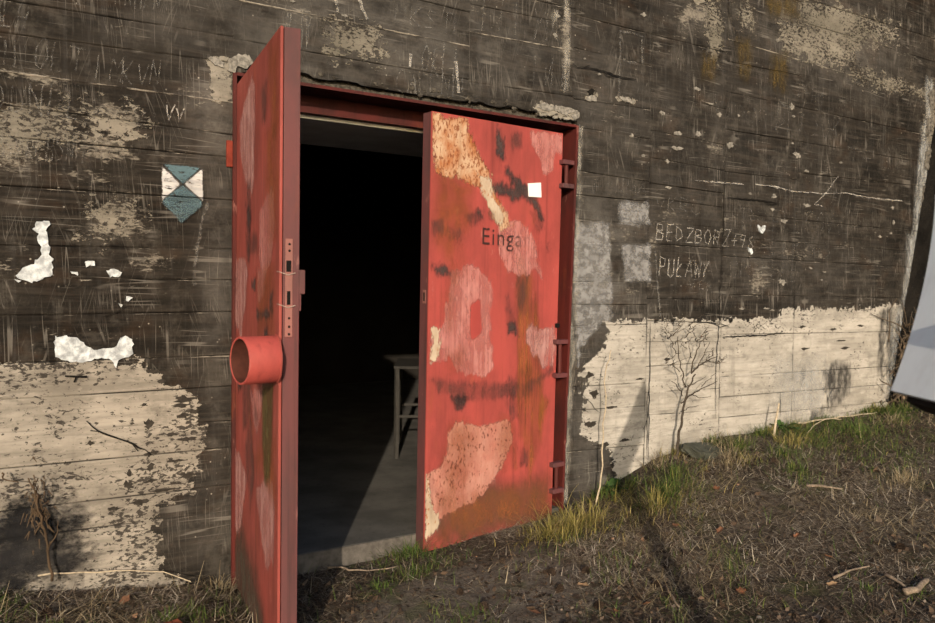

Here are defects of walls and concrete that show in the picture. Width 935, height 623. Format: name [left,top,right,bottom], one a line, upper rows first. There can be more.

peeling [205,54,253,104]
spalling [300,9,580,124]
spalling [585,88,599,102]
corrosion [432,112,510,231]
peeling [577,302,903,479]
peeling [0,355,209,593]